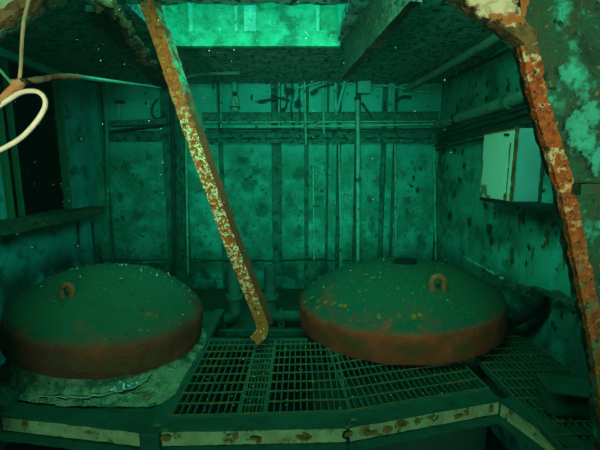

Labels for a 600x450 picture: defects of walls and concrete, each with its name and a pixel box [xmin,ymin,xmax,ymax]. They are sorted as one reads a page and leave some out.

peeling [467,0,522,27]